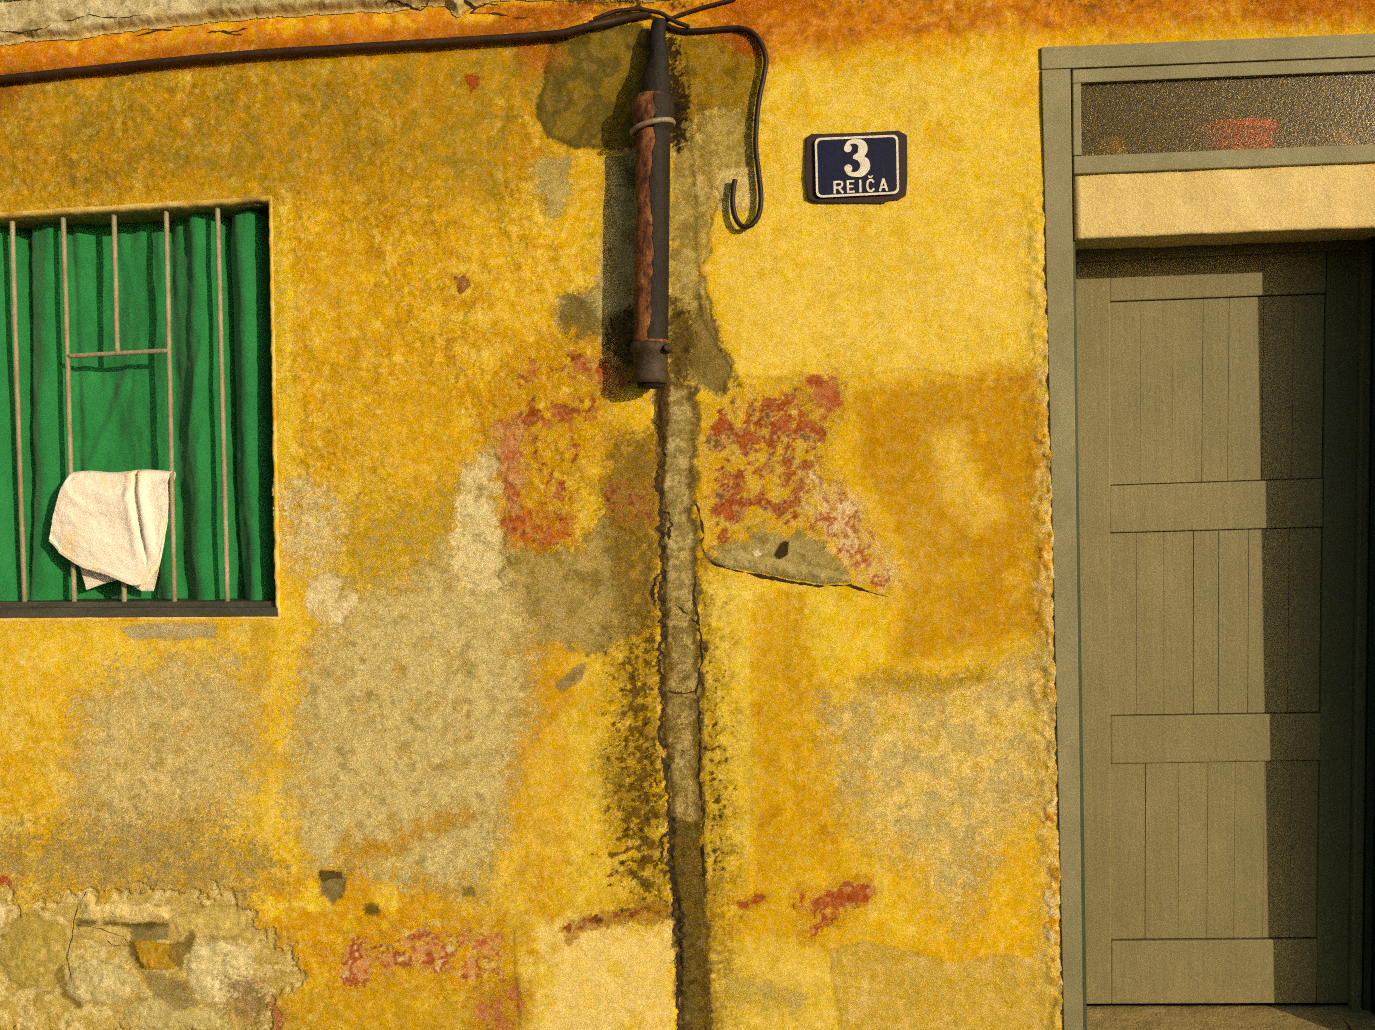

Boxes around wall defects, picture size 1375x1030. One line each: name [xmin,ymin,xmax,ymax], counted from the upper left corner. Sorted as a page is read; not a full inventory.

water stain [536,0,650,188]
water stain [666,30,762,153]
water stain [559,293,634,384]
peeling [668,106,908,606]
flaking render [0,146,672,1030]
water stain [591,611,737,1030]
crack [647,389,885,1030]